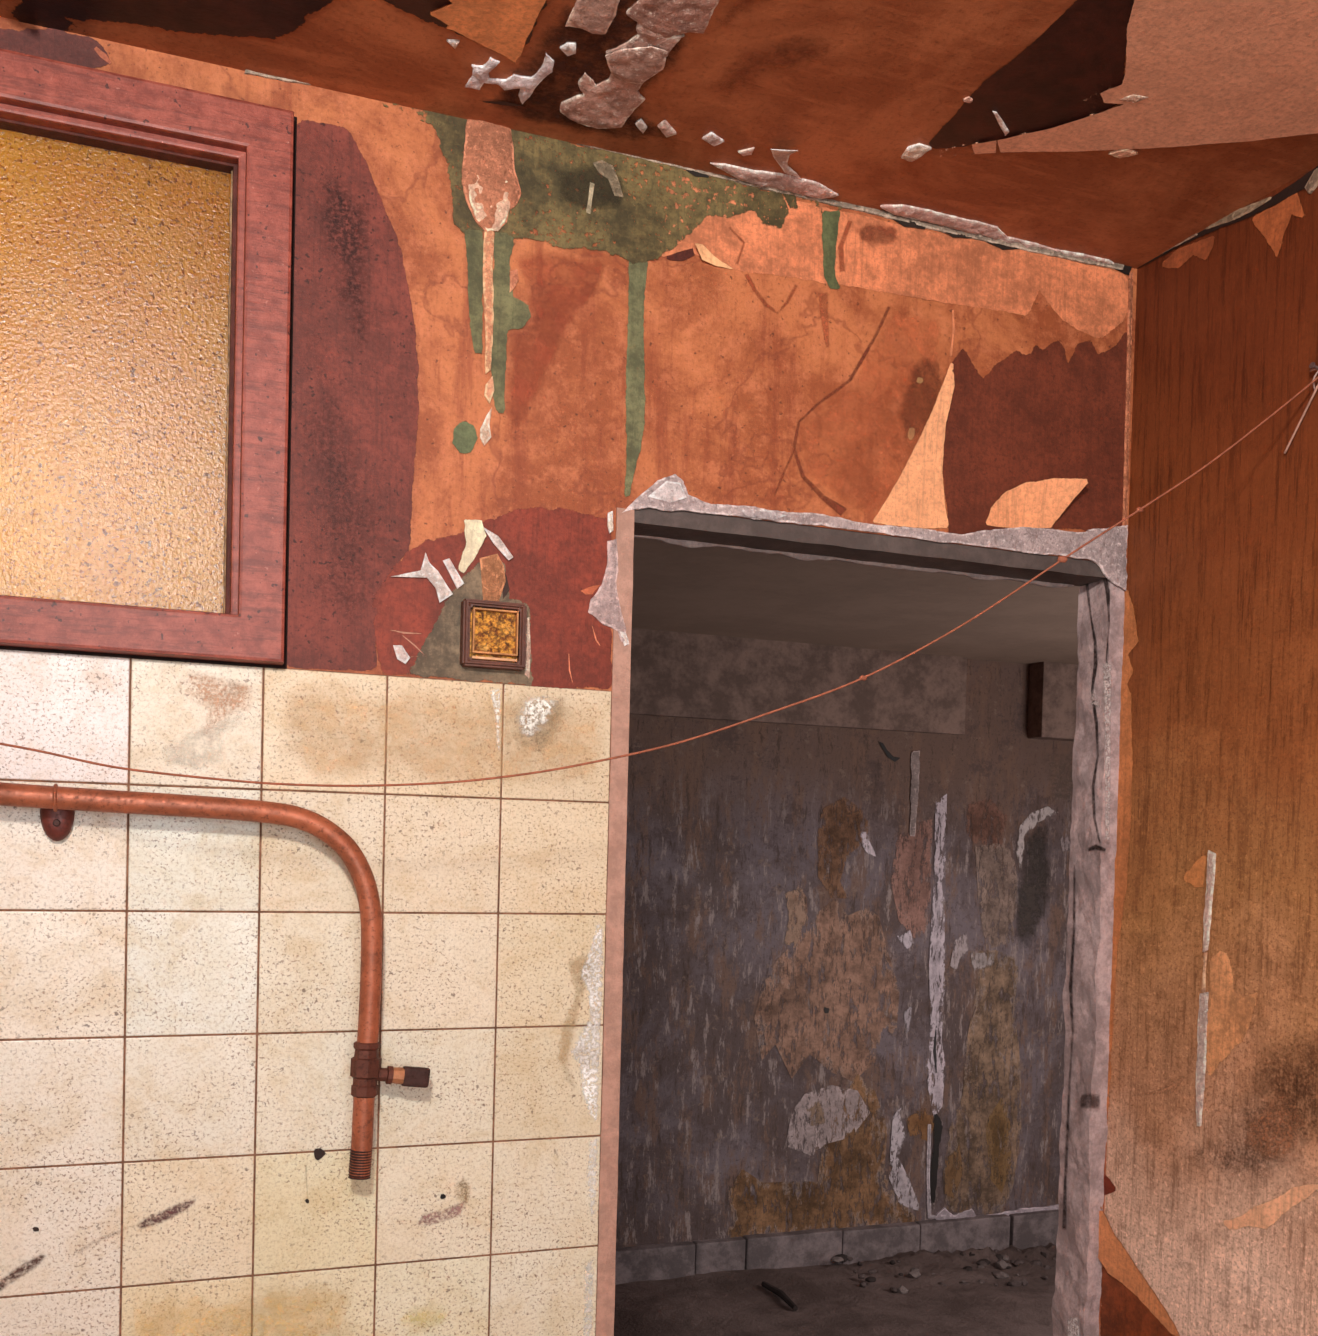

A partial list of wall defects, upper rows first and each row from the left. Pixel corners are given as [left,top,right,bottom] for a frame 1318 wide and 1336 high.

peeling [11,0,333,40]
peeling [384,0,465,49]
spalling [465,0,719,137]
peeling [929,0,1134,149]
water stain [730,228,796,310]
water stain [838,221,896,271]
peeling [382,102,1128,646]
peeling [391,519,533,748]
water stain [1223,1064,1318,1167]